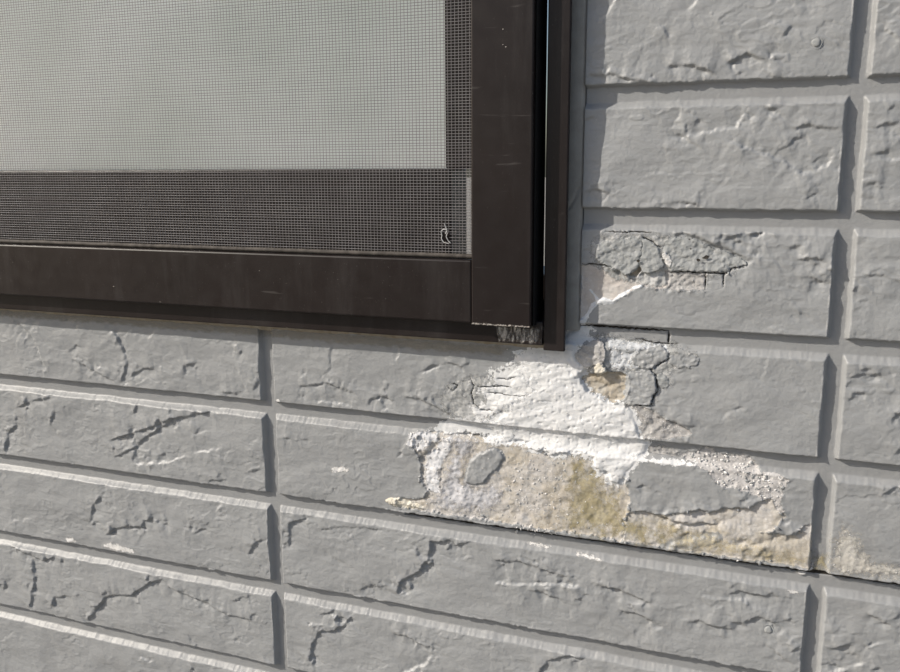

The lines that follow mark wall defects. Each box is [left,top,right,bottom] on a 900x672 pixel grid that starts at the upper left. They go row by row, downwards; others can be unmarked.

peeling [580,232,747,320]
spalling [402,332,814,569]